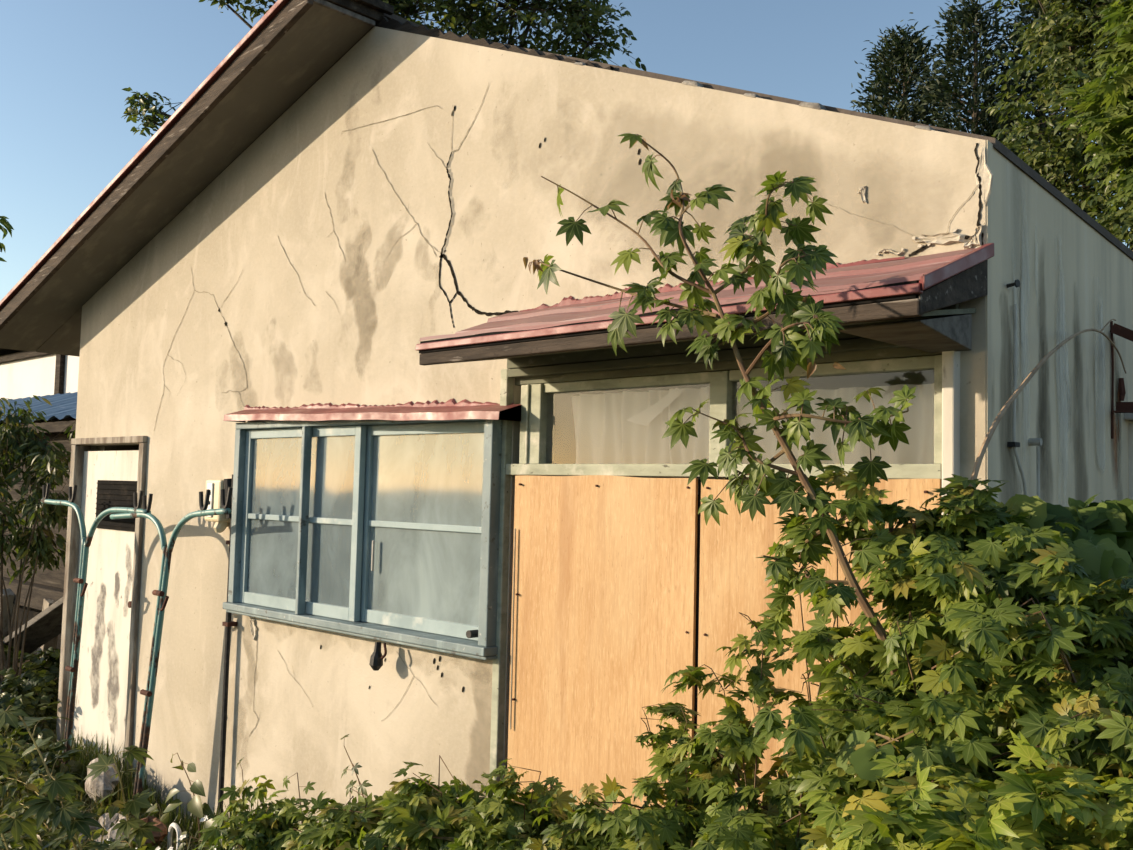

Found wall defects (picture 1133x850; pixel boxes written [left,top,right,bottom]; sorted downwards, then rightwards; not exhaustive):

crack [341,83,518,328]
crack [760,143,984,257]
flaking render [876,225,985,256]
crack [154,267,247,429]
water stain [92,573,131,731]